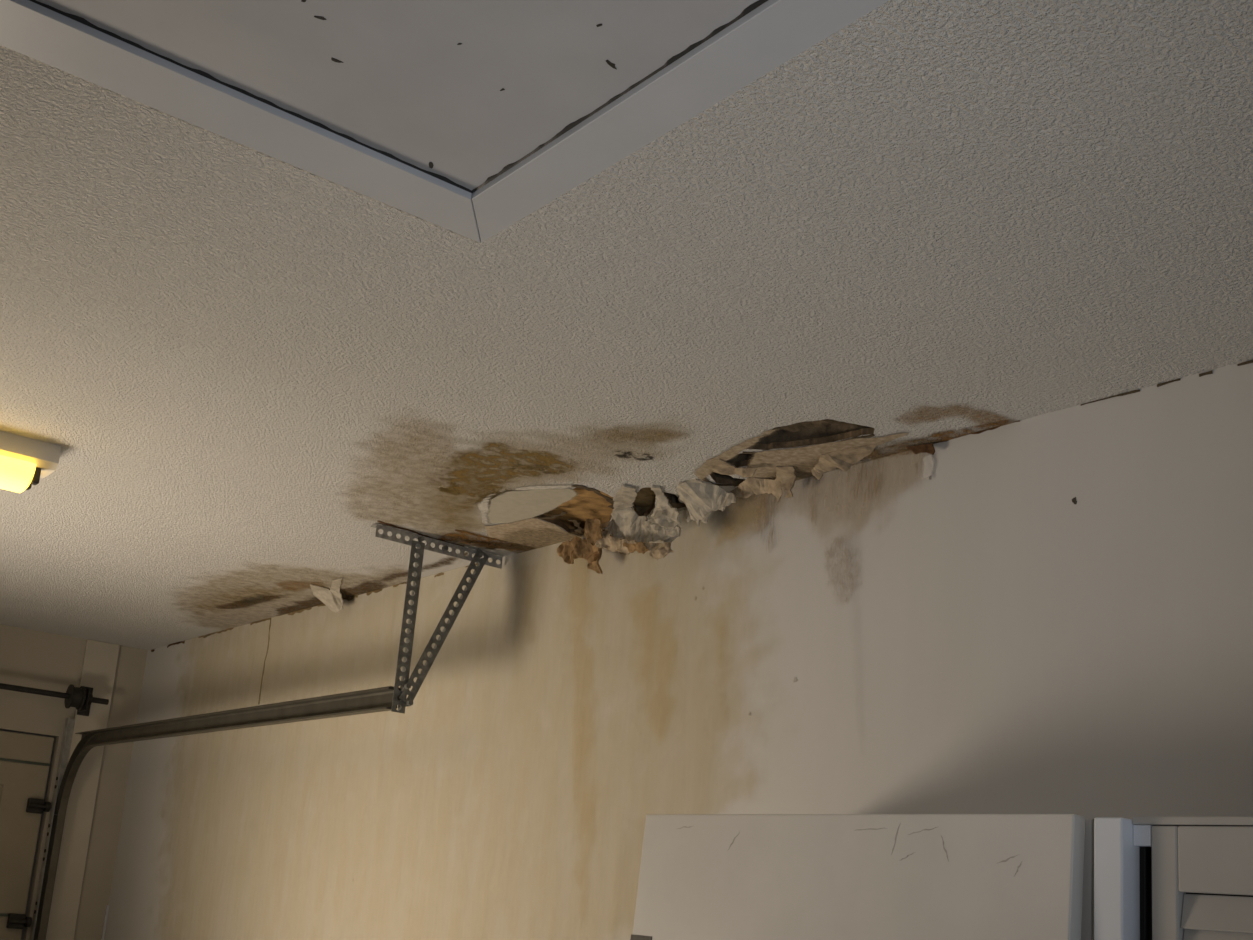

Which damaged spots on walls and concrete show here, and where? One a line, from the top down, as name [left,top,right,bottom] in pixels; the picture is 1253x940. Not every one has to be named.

damp [445,443,573,509]
peeling [557,429,796,574]
damp [220,582,324,616]
damp [340,552,468,599]